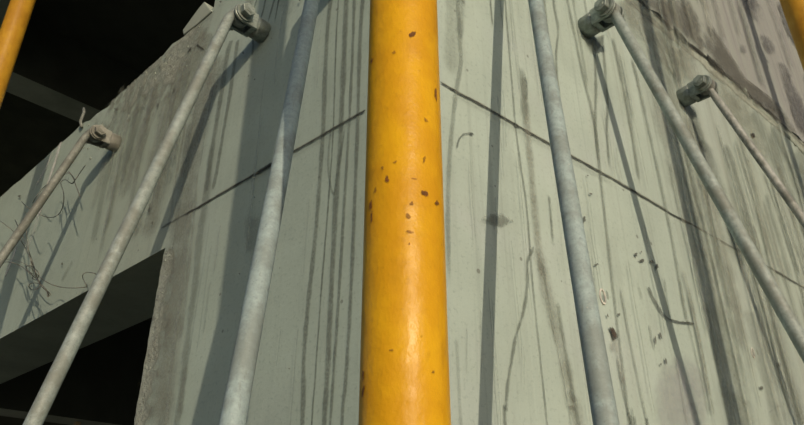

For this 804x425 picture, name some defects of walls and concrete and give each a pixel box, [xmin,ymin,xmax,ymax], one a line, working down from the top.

water stain [188,42,238,187]
water stain [579,36,623,180]
water stain [646,0,780,111]
water stain [783,75,804,132]
water stain [504,145,539,425]
crack [648,287,694,324]